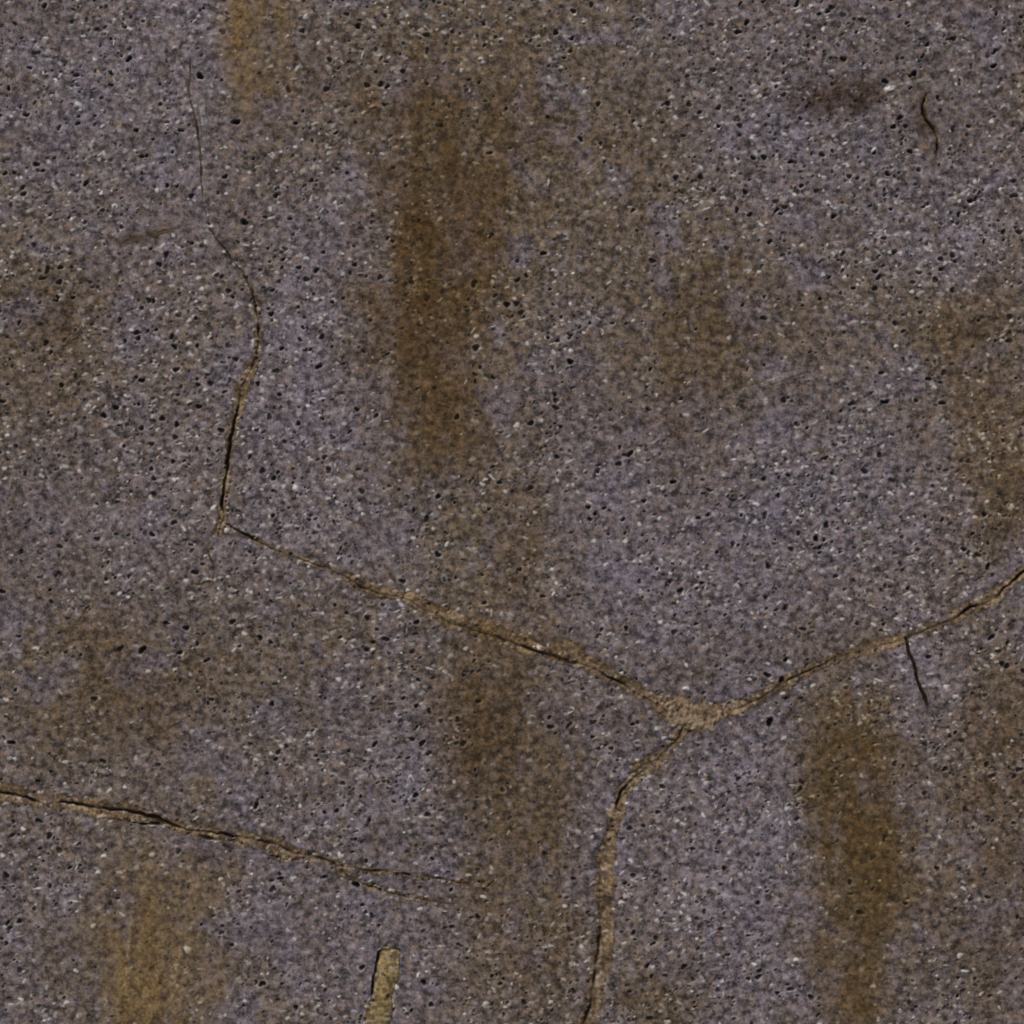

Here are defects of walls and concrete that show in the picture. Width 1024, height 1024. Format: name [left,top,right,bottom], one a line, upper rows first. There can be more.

crack [0,782,493,904]
crack [187,61,1024,1024]